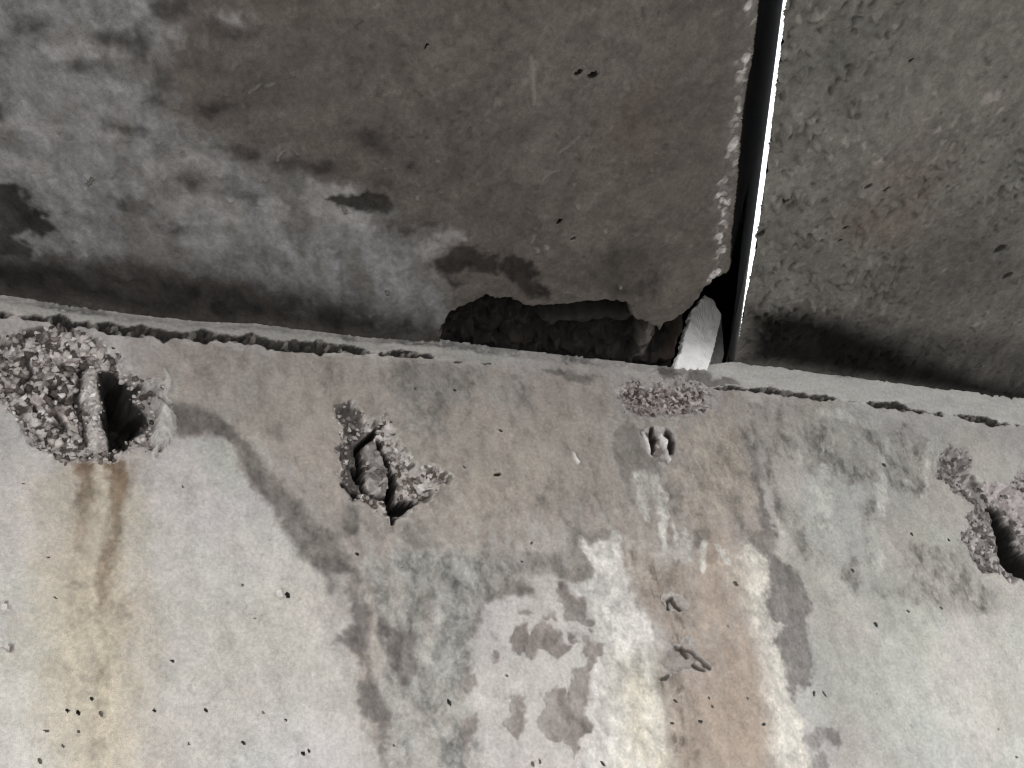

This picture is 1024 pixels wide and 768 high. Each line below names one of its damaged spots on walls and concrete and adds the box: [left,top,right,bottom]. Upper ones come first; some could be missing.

spalling [0,321,178,466]